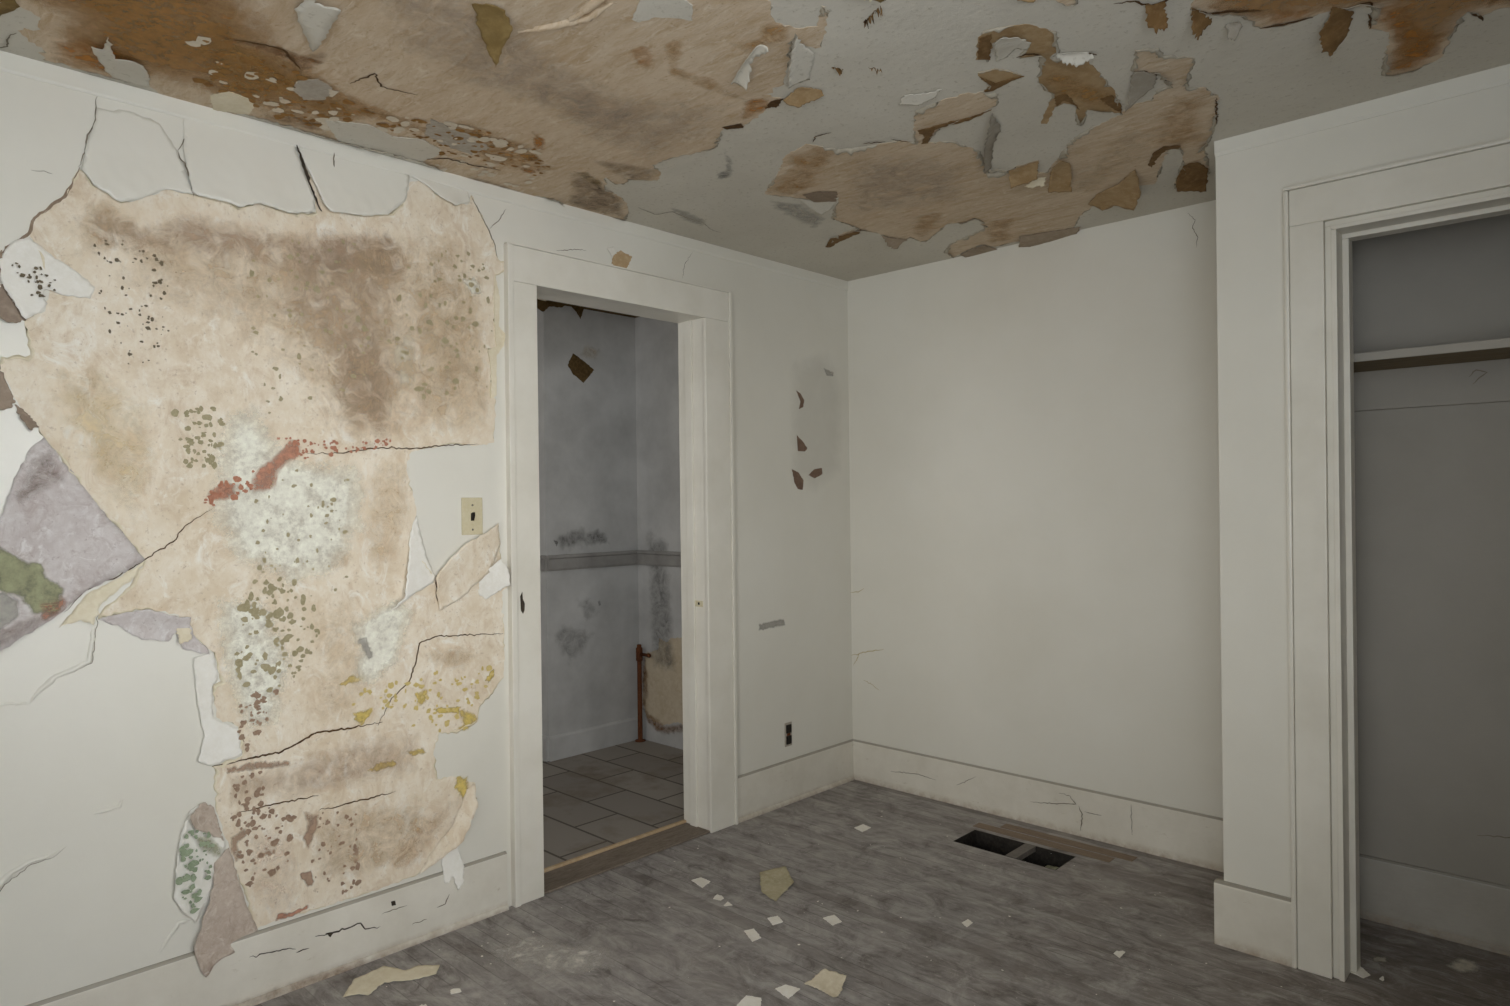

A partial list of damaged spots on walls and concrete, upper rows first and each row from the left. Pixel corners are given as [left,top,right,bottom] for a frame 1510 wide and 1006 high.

peeling [294,0,341,51]
peeling [91,39,151,88]
peeling [210,91,254,115]
crack [296,145,335,211]
peeling [607,246,632,268]
water stain [93,224,494,420]
peeling [792,468,822,490]
crack [0,510,210,707]
water stain [171,406,391,919]
water stain [340,665,494,732]
water stain [370,749,424,771]
water stain [455,776,467,797]